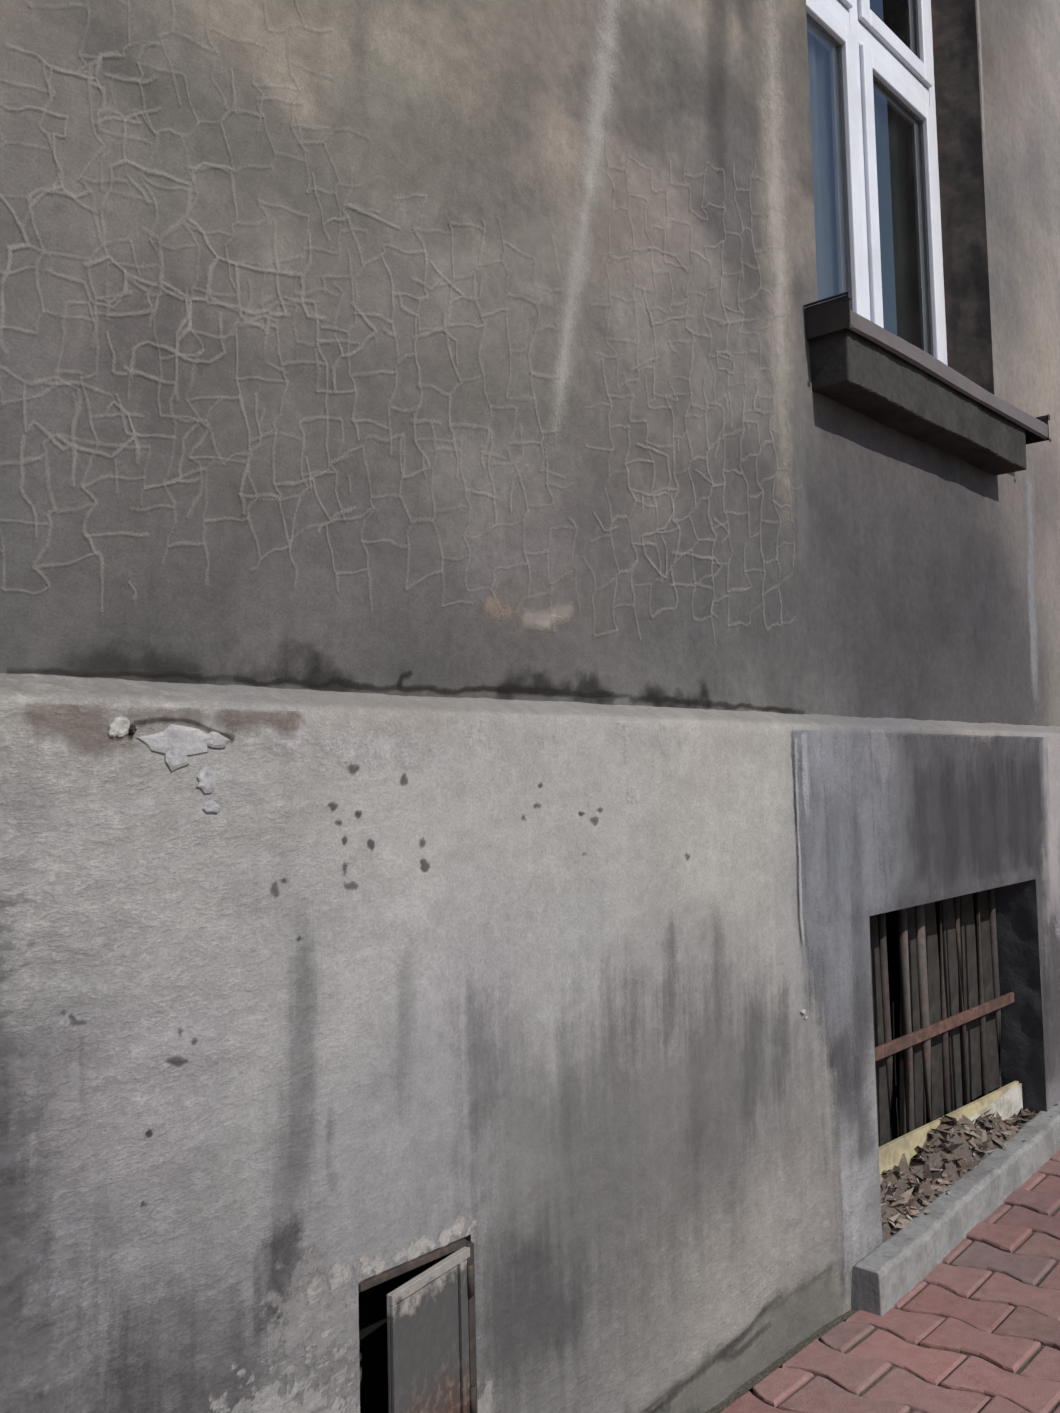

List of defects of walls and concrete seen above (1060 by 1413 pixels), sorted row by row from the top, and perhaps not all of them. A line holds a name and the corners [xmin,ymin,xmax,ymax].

leakage [86,653,198,684]
leakage [277,653,349,692]
leakage [499,674,612,704]
leakage [646,685,710,709]
leakage [269,712,412,762]
peeling [107,716,229,813]
leakage [801,733,809,812]
leakage [1043,922,1060,1082]
spalling [210,1217,476,1413]
spalling [477,1380,492,1413]